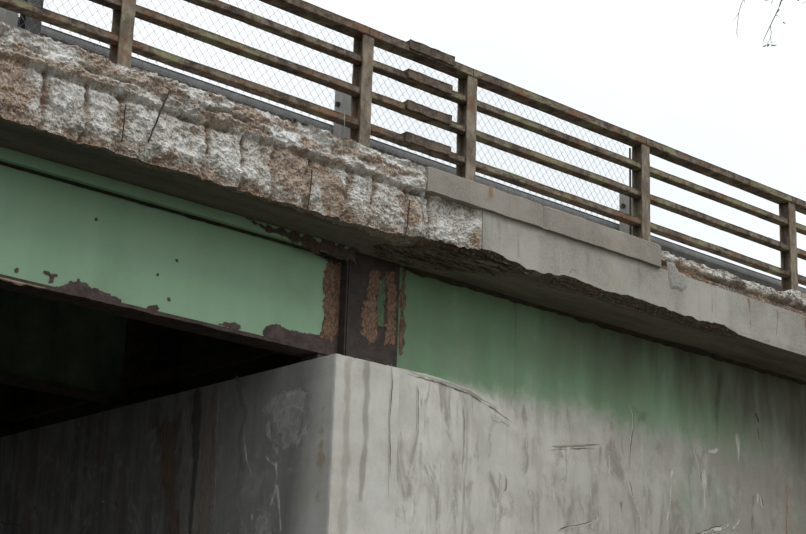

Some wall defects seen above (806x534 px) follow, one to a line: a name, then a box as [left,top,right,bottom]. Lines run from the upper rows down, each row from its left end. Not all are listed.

spalling [0,21,746,339]
corrosion [0,161,358,347]
corrosion [360,269,406,355]
spalling [661,250,806,319]
crack [460,407,468,460]
crack [697,520,740,534]